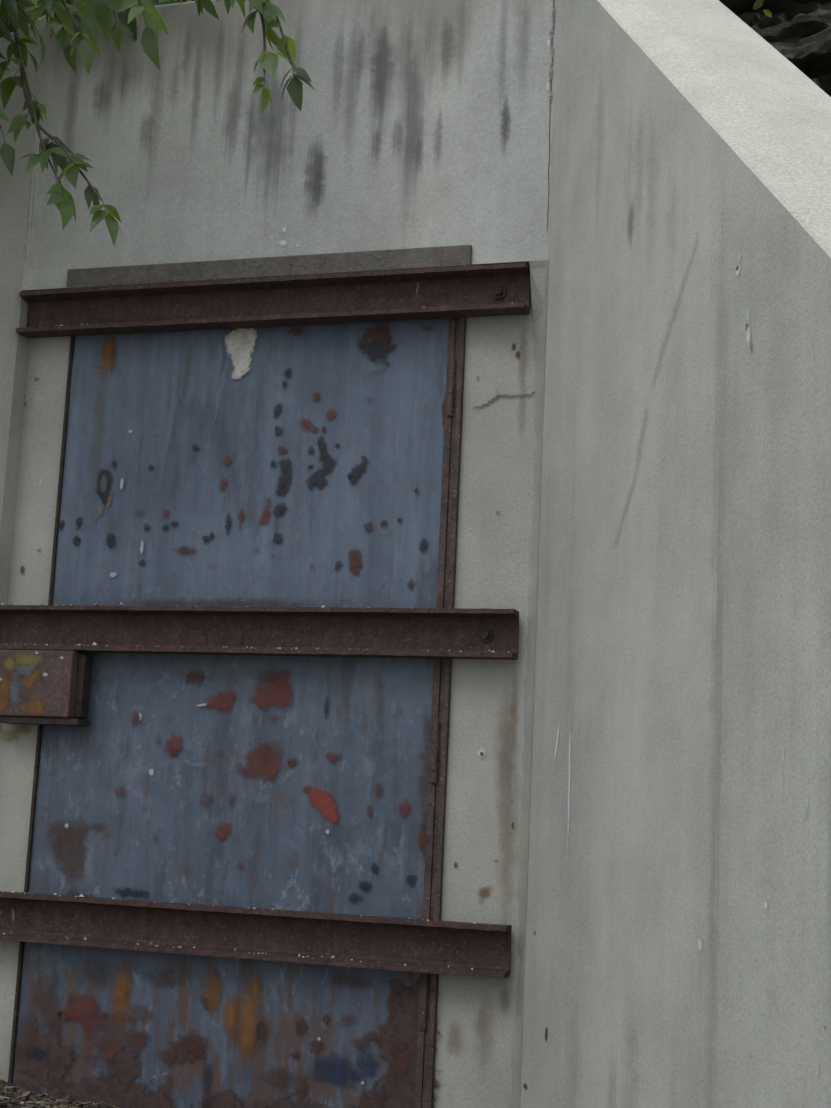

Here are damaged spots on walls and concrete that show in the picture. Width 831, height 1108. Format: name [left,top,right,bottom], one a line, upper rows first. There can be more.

damp [375,35,388,102]
crack [547,0,555,227]
damp [308,151,323,200]
peeling [224,328,257,379]
crack [473,392,535,409]
peeling [270,403,292,517]
peeling [306,426,339,490]
peeling [59,460,124,546]
rust [201,972,237,1032]
rust [11,966,208,1108]
rust [349,979,440,1108]
rust [201,1068,332,1108]